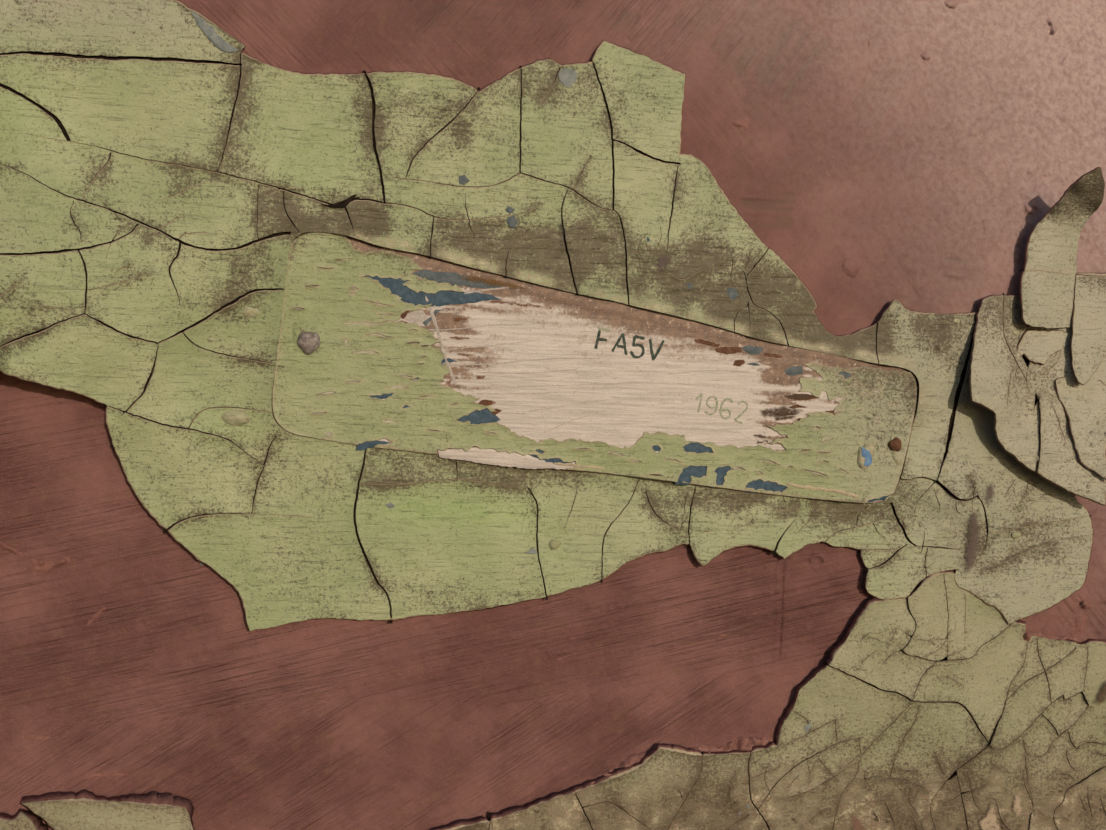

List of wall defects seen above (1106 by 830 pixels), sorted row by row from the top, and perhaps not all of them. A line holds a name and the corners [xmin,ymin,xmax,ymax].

crack [0,51,789,533]
peeling [0,0,1106,632]
crack [823,310,988,578]
crack [353,449,393,624]
crack [527,488,548,600]
crack [600,481,695,583]
peeling [0,789,194,830]
peeling [432,570,1106,830]
crack [824,663,998,749]
crack [947,771,1010,830]
crack [1037,645,1106,814]